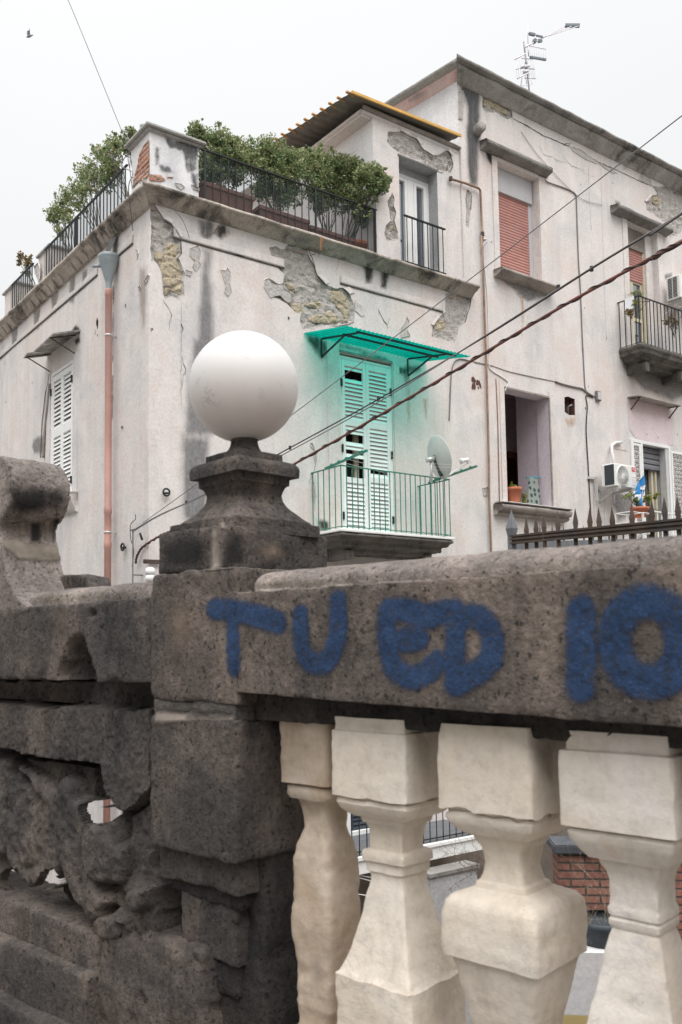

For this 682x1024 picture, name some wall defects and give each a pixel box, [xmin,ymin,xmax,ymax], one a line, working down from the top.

flaking render [132,139,199,190]
leakage [156,139,198,188]
spalling [387,128,454,173]
leakage [462,87,492,184]
crack [512,112,648,185]
spalling [136,203,201,301]
leakage [195,256,211,359]
leakage [201,222,226,238]
spalling [264,245,365,330]
spalling [431,293,471,343]
spalling [639,174,682,240]
leakage [185,402,210,518]